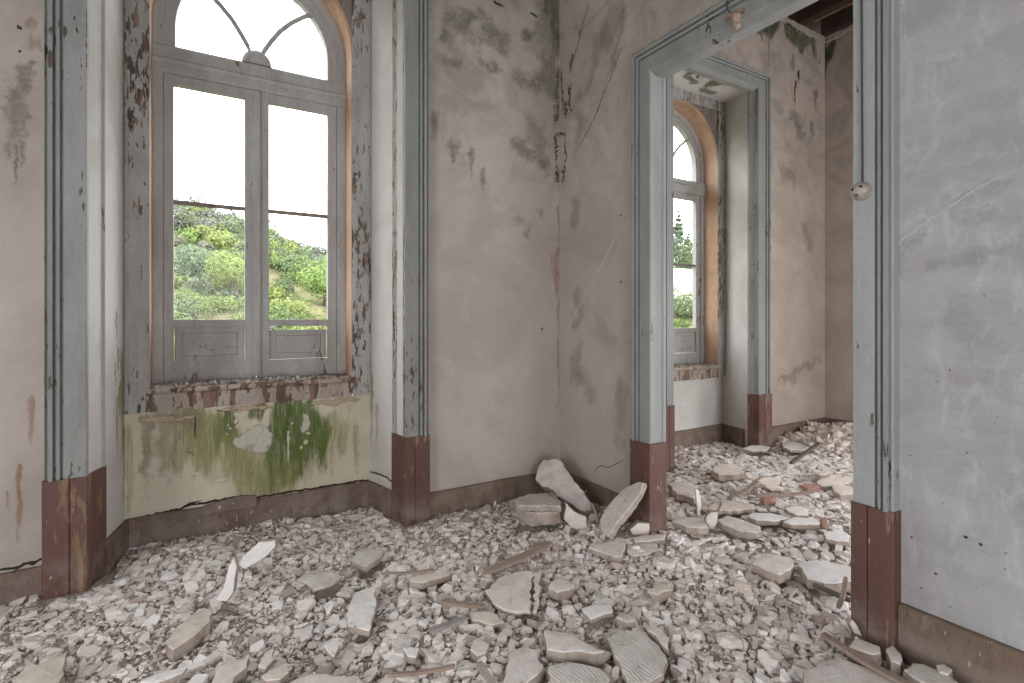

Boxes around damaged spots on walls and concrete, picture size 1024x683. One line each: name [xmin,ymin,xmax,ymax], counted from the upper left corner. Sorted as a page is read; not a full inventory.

damp [530,0,559,97]
crack [569,3,589,73]
peeling [553,68,572,211]
crack [575,48,621,153]
damp [185,411,293,489]
crack [145,471,392,516]
crack [0,558,42,571]